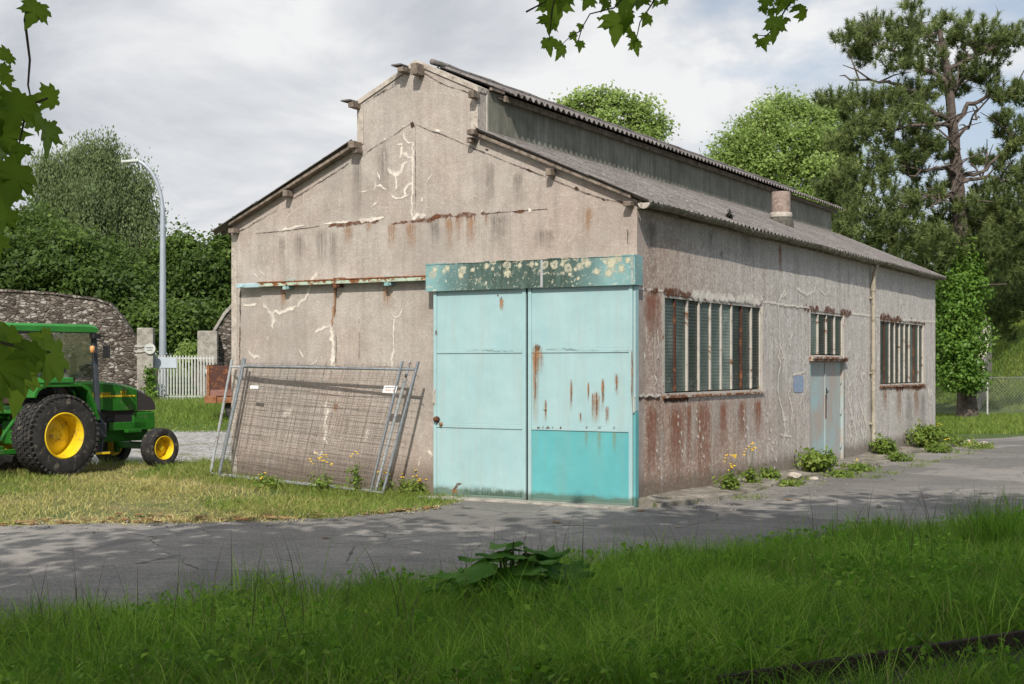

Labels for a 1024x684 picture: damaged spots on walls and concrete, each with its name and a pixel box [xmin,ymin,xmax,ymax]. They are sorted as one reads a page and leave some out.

peeling [324,202,384,224]
rust [328,208,545,234]
rust [639,287,691,319]
rust [804,305,852,317]
rust [880,313,926,326]
rust [533,344,561,429]
rust [580,375,617,428]
rust [647,393,725,454]